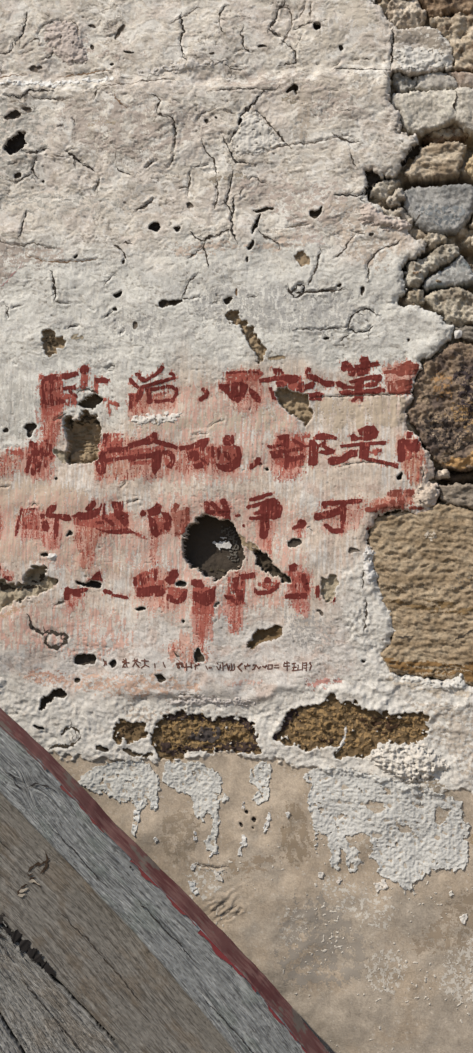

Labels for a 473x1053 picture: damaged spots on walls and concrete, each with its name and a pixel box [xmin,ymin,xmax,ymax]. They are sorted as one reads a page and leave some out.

crack [0,0,423,304]
hole [365,171,380,196]
flaking render [401,145,420,167]
crack [0,212,132,333]
crack [294,307,381,342]
flaking render [3,288,423,548]
flaking render [0,492,339,623]
flaking render [96,708,262,763]
flaking render [275,693,430,760]
peeling [237,802,271,856]
peeling [188,846,218,895]
peeling [373,879,388,893]